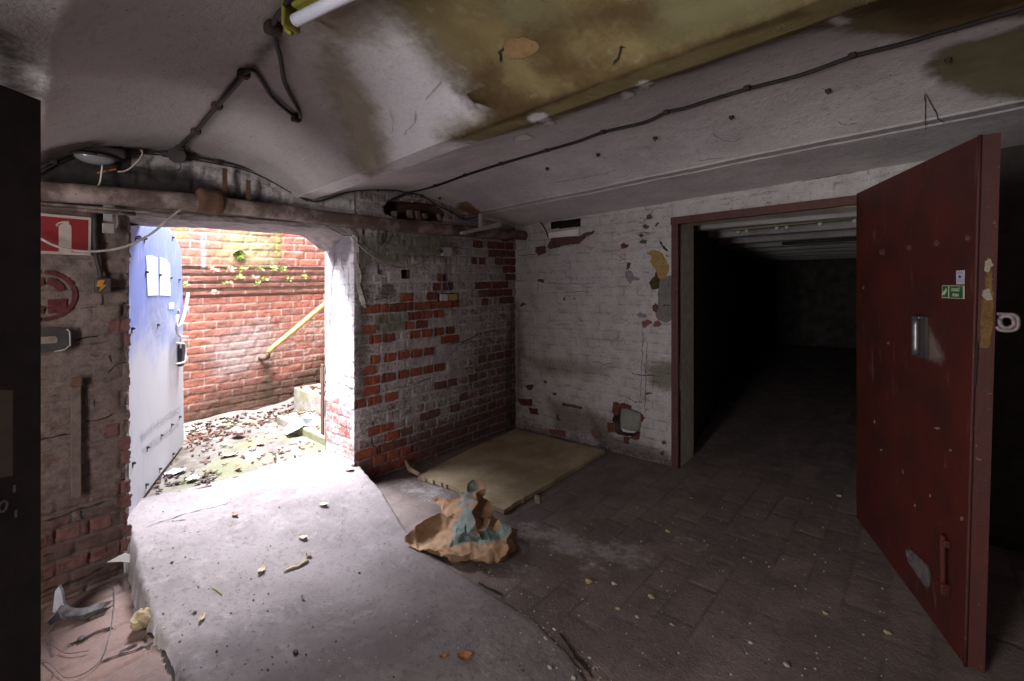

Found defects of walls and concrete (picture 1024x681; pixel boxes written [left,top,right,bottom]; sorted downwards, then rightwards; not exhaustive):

water stain [390,0,1024,142]
spalling [382,201,445,222]
peeling [471,239,526,306]
flaking render [535,218,594,255]
flaking render [621,214,669,283]
peeling [353,235,510,413]
peeling [637,303,661,328]
peeling [356,422,417,478]
peeling [518,380,582,436]
spalling [591,402,645,444]
crack [478,581,503,596]
crack [559,632,593,679]